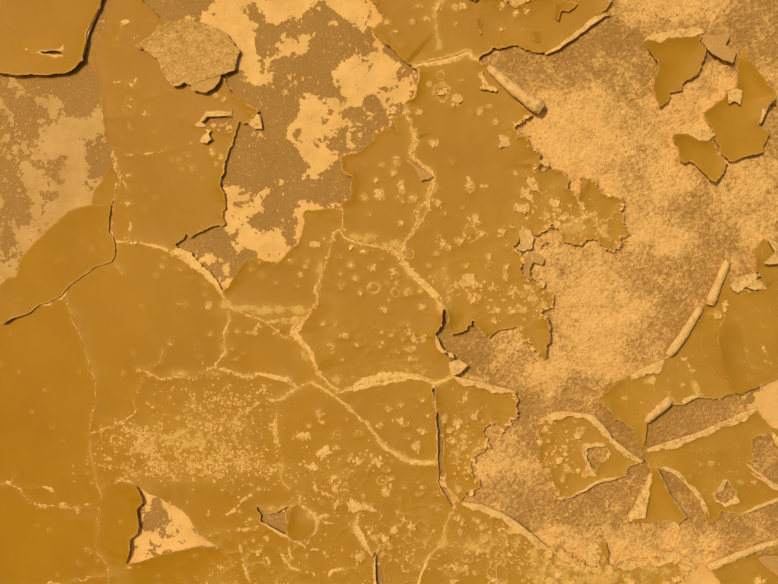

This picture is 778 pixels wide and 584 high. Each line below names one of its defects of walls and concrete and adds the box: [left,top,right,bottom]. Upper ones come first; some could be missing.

peeling [0,0,115,324]
peeling [135,0,419,291]
crack [43,108,453,466]
peeling [432,0,778,584]
crack [2,478,134,520]
crack [47,552,109,584]
peeling [126,486,216,563]
peeling [257,504,316,548]
crack [209,481,377,583]
crack [416,501,457,584]